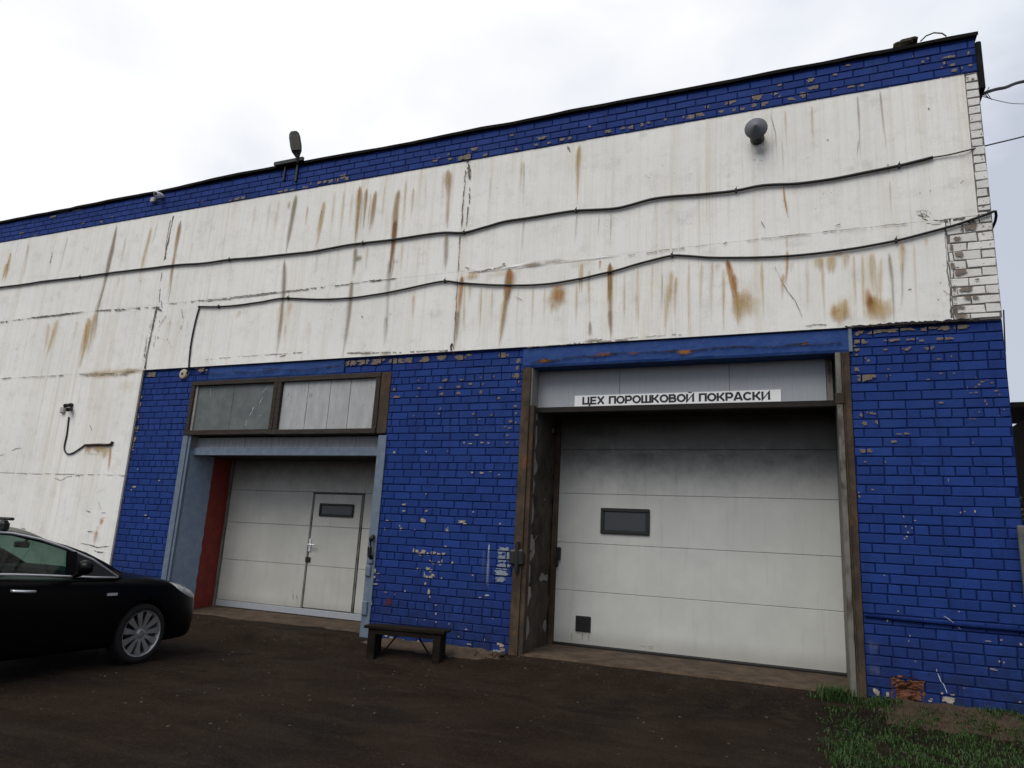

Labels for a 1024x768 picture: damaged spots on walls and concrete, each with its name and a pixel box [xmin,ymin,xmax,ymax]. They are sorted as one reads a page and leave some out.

peeling [683,78,819,119]
peeling [432,147,487,162]
corrosion [355,187,376,236]
corrosion [499,269,512,340]
corrosion [723,261,738,320]
corrosion [867,296,885,316]
peeling [853,210,980,381]
peeling [346,354,472,366]
peeling [488,545,511,582]
peeling [413,546,453,623]
spalling [873,675,955,704]